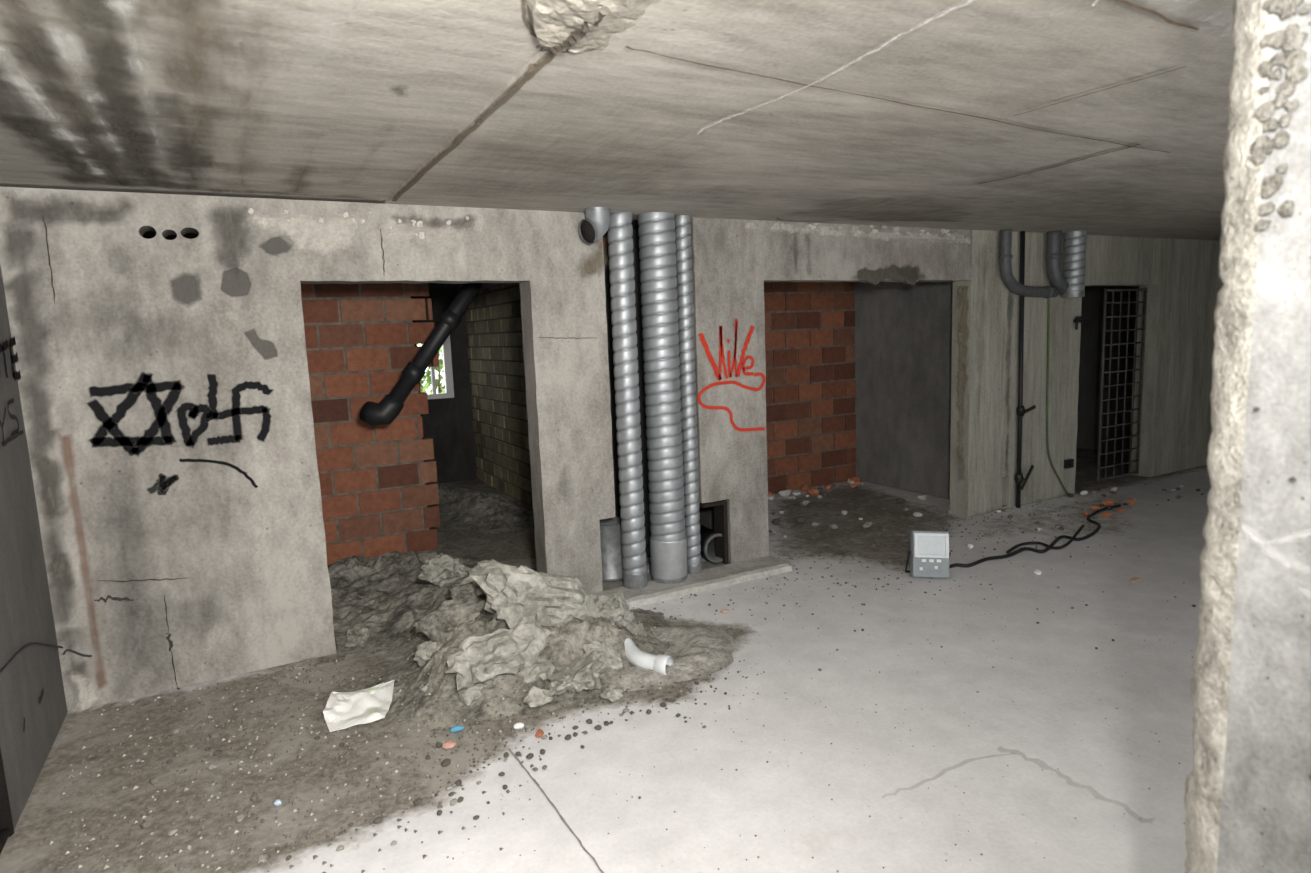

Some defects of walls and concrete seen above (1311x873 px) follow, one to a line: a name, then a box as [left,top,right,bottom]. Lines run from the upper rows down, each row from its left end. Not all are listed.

spalling [522,0,660,56]
crack [1115,0,1199,30]
water stain [0,0,209,190]
crack [626,46,1186,184]
spalling [1248,0,1311,231]
water stain [12,200,129,222]
water stain [431,217,473,229]